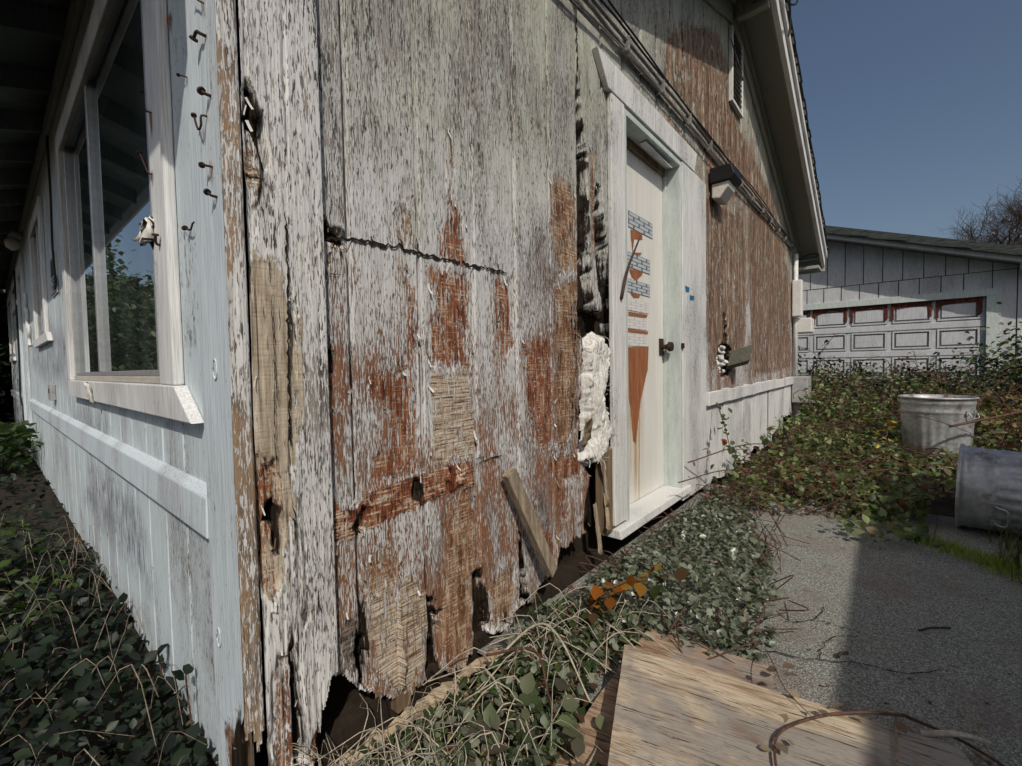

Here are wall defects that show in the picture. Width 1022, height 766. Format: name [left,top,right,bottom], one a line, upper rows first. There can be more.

peeling [249,250,307,612]
crack [271,211,292,475]
crack [324,214,506,288]
peeling [360,122,521,669]
peeling [491,173,583,563]
peeling [661,18,791,380]